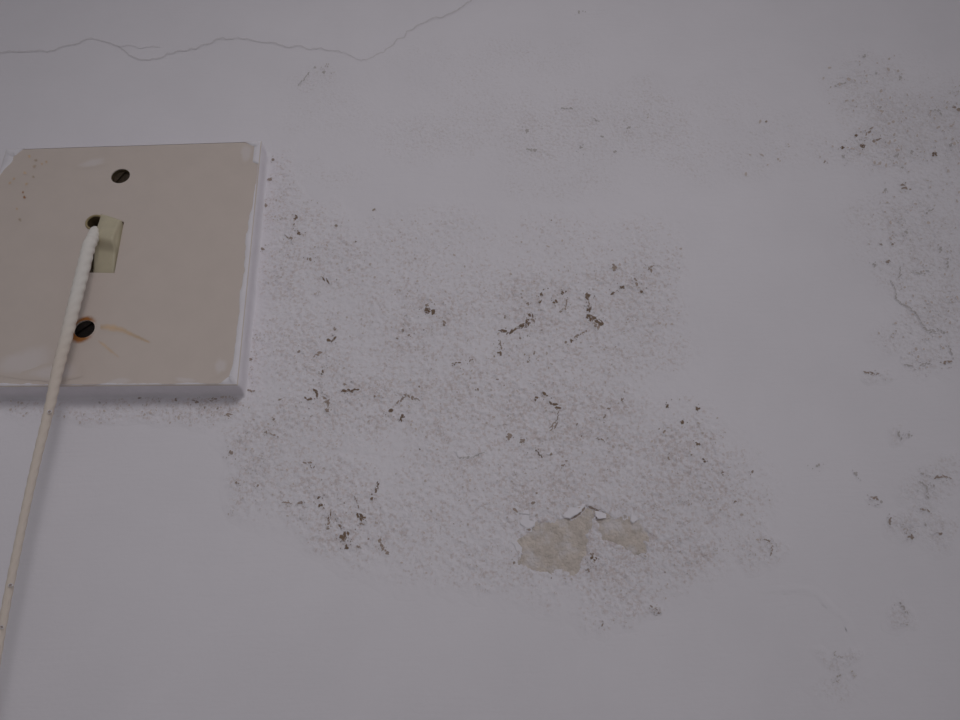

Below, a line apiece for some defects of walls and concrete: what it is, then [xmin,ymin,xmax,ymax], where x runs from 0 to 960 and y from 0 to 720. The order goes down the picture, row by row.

crack [0,0,472,61]
peeling [510,500,649,576]